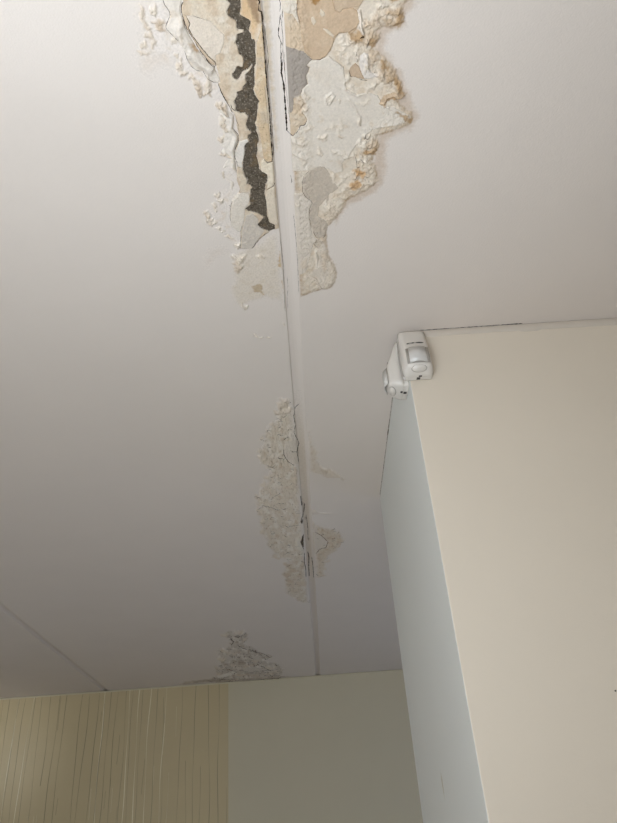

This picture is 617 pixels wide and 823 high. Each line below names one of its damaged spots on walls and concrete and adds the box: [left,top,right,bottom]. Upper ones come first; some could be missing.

crack [163,1,240,165]
peeling [135,0,279,249]
crack [229,171,329,305]
crack [258,0,307,163]
peeling [281,0,415,299]
leakage [333,0,423,235]
crack [257,402,342,592]
peeling [253,396,346,603]
peeling [177,629,298,685]